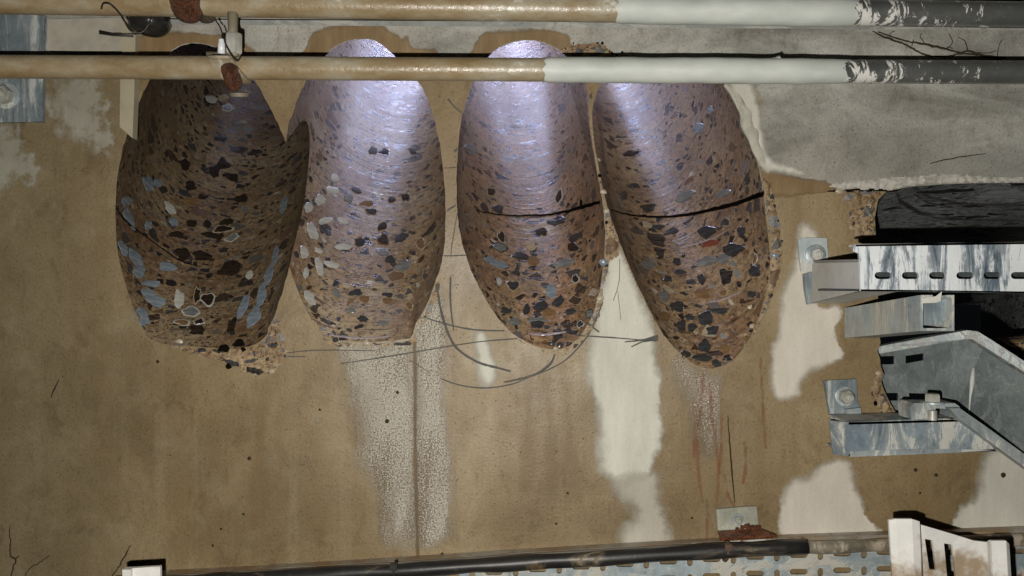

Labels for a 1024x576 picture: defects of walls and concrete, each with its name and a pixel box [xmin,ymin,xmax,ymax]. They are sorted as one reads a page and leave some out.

crack [872,31,1005,60]
crack [477,191,764,218]
crack [807,179,887,192]
water stain [771,224,844,400]
water stain [339,298,450,547]
water stain [587,251,672,543]
rust [735,523,761,531]
water stain [778,460,882,535]
water stain [952,450,1024,528]